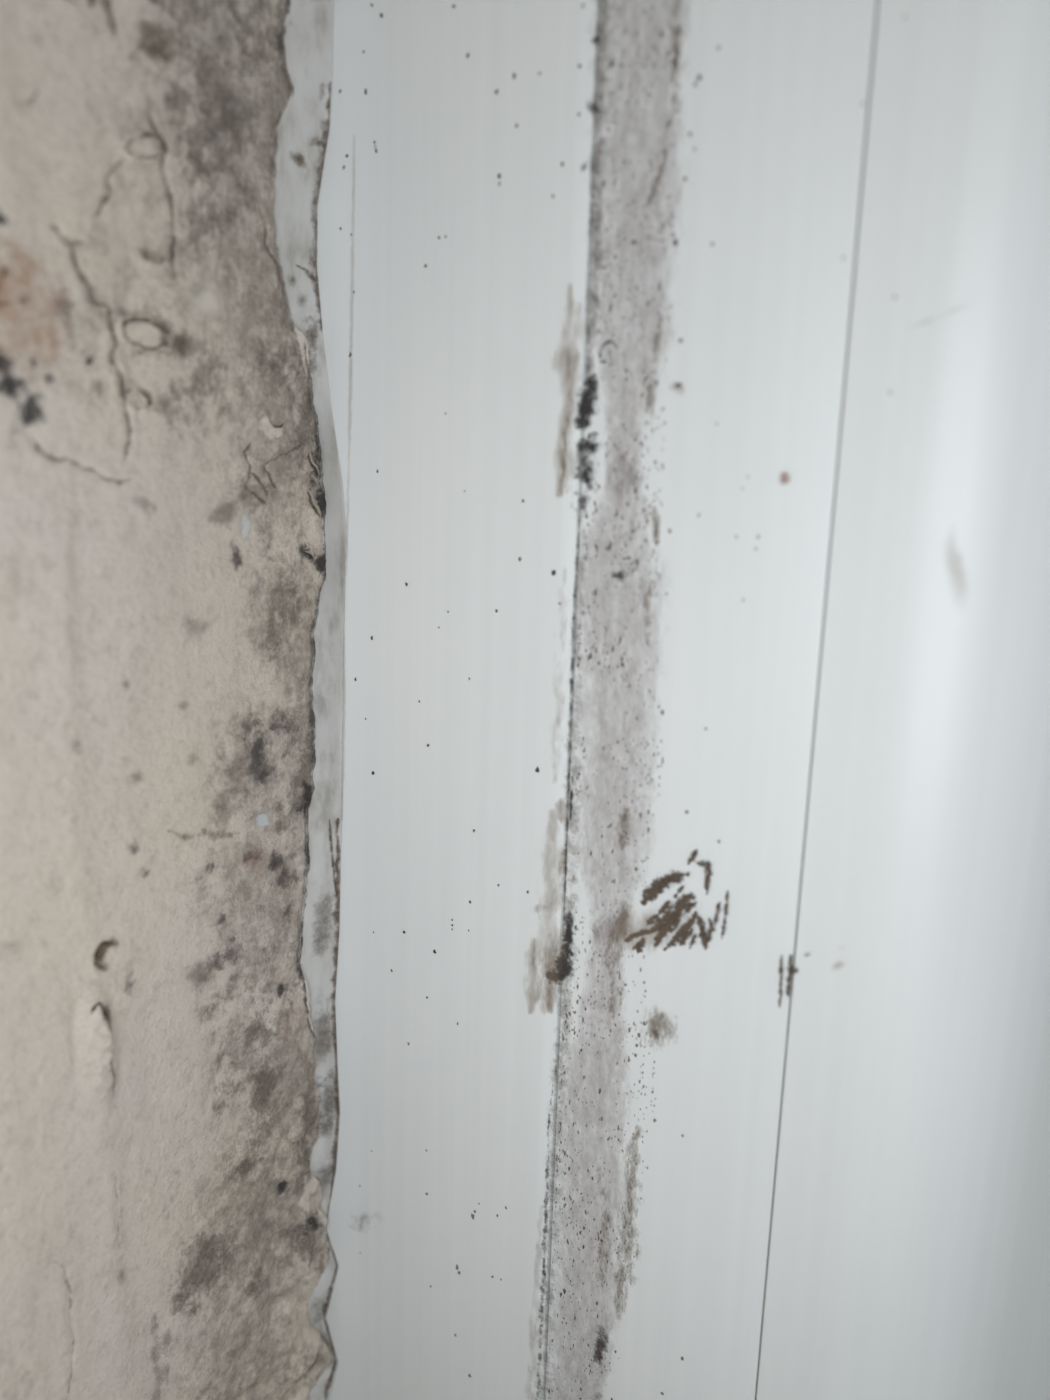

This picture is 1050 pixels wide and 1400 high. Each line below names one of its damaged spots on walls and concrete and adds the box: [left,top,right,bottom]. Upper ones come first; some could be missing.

damp [199,0,294,222]
crack [149,116,176,280]
damp [0,354,54,427]
crack [36,159,131,484]
peeling [307,447,323,518]
damp [217,87,341,1396]
damp [537,3,702,1400]
peeling [295,969,314,1033]
damp [184,1240,227,1291]